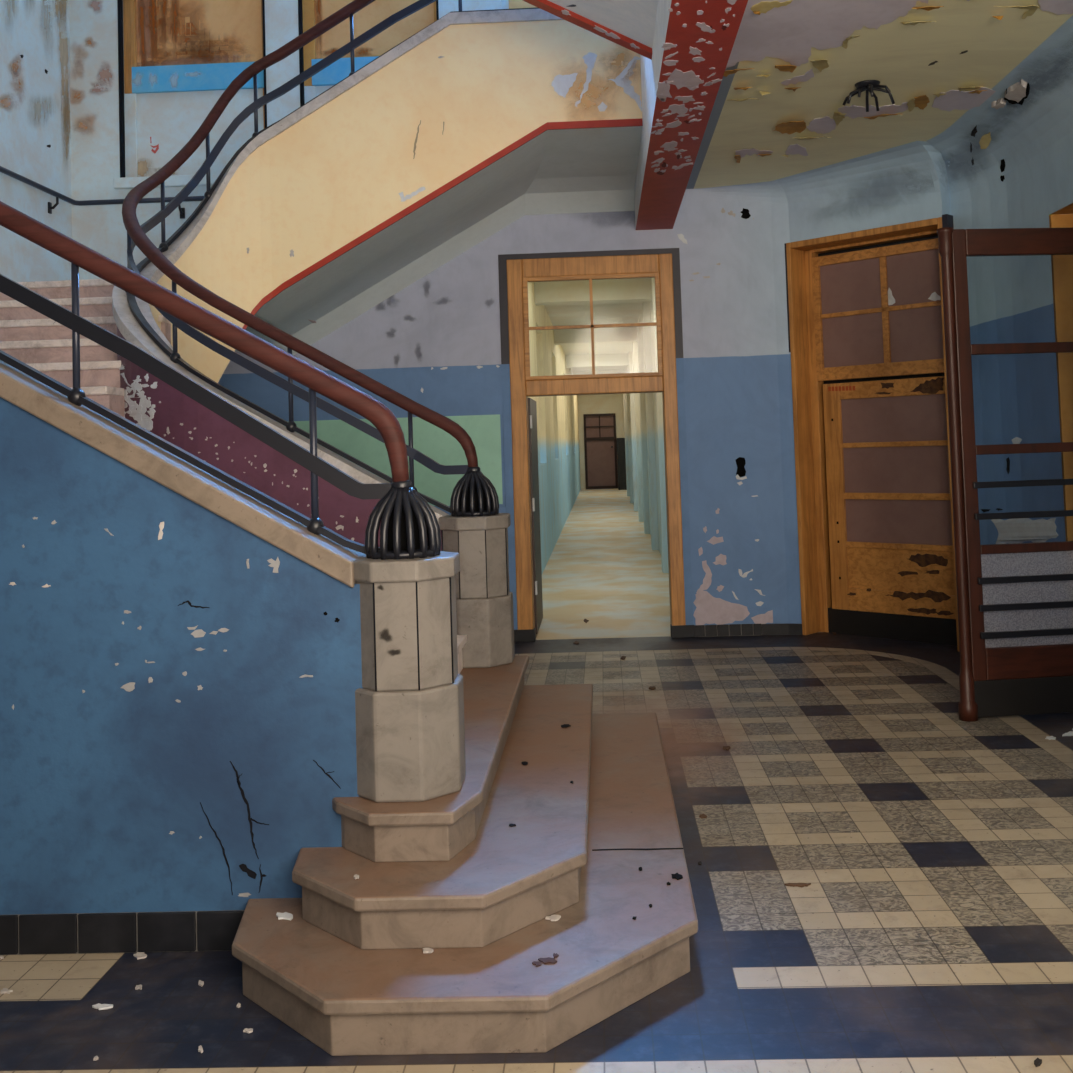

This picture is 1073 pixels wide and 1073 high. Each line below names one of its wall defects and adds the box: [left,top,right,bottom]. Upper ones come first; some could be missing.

peeling [552,52,597,107]
peeling [594,25,642,112]
peeling [650,0,944,175]
peeling [734,79,1030,166]
spalling [721,208,754,220]
peeling [119,365,161,431]
peeling [164,423,297,487]
peeling [267,557,280,573]
peeling [693,526,773,625]
peeling [187,626,229,651]
crack [200,802,233,895]
crack [230,761,269,892]